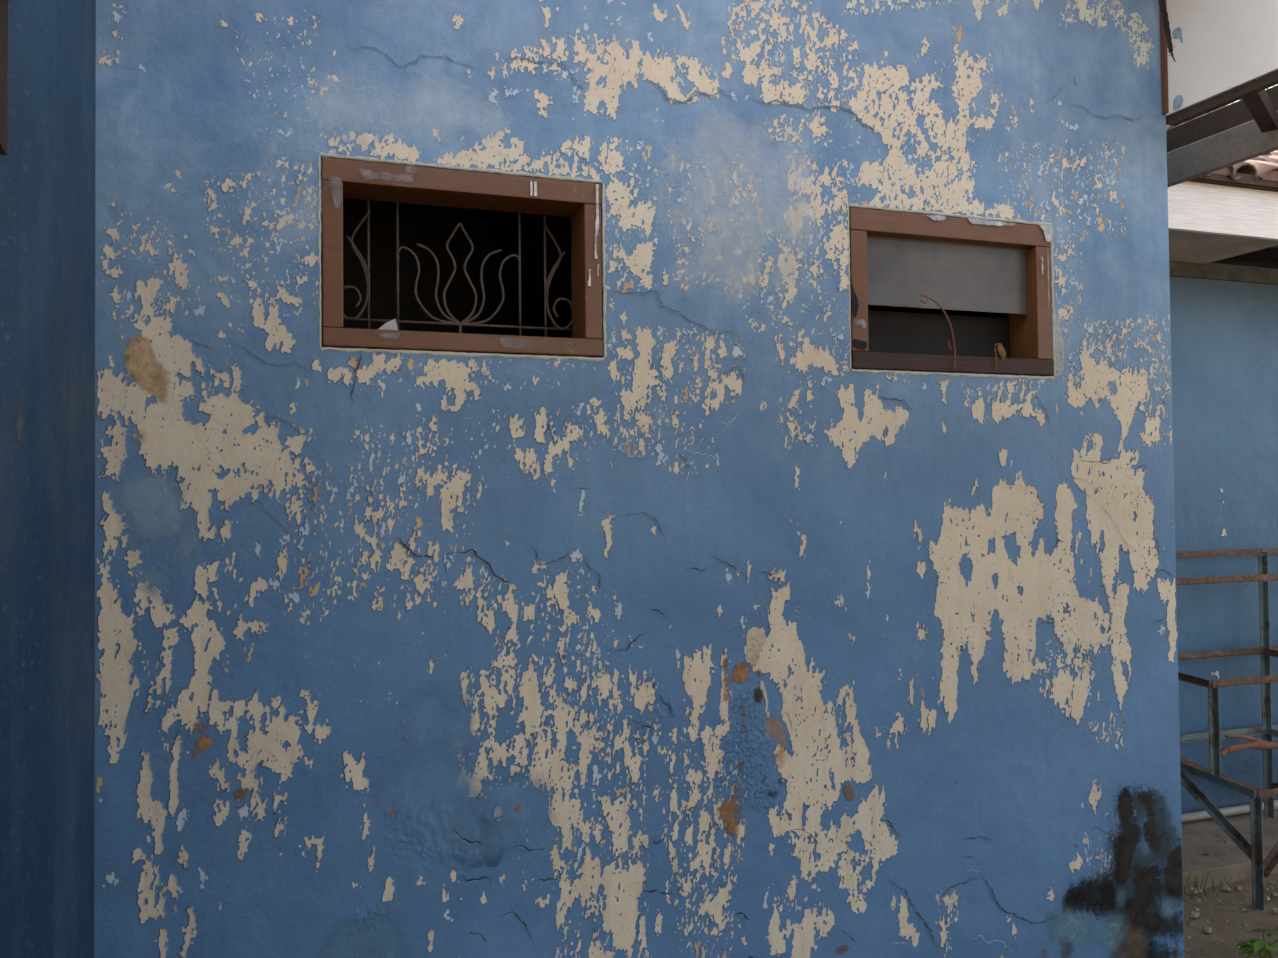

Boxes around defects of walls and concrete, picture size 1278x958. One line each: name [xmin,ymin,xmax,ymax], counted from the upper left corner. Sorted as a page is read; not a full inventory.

peeling [97,4,123,67]
peeling [220,10,340,137]
crack [346,39,584,90]
leakage [126,336,166,401]
peeling [324,0,1178,958]
peeling [95,157,748,958]
corrosion [722,658,751,700]
corrosion [719,784,741,836]
crack [891,836,1062,952]
leakage [1055,788,1183,958]